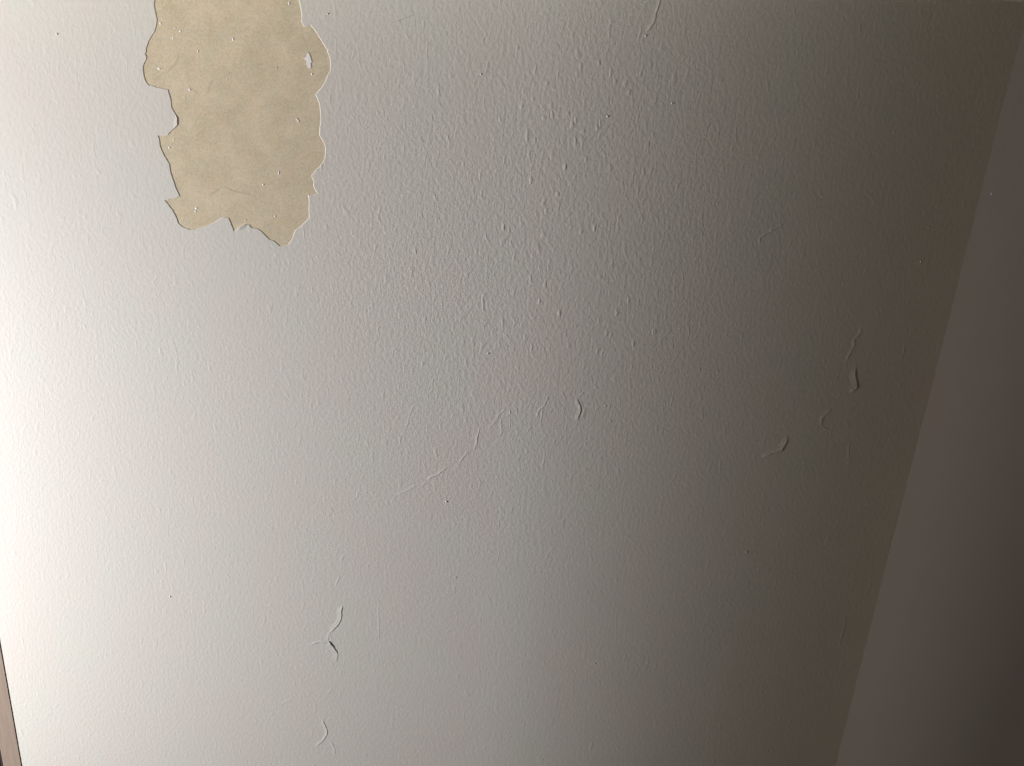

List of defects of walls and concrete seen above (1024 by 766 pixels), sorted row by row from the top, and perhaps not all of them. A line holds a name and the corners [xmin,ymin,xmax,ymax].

peeling [143,0,331,246]